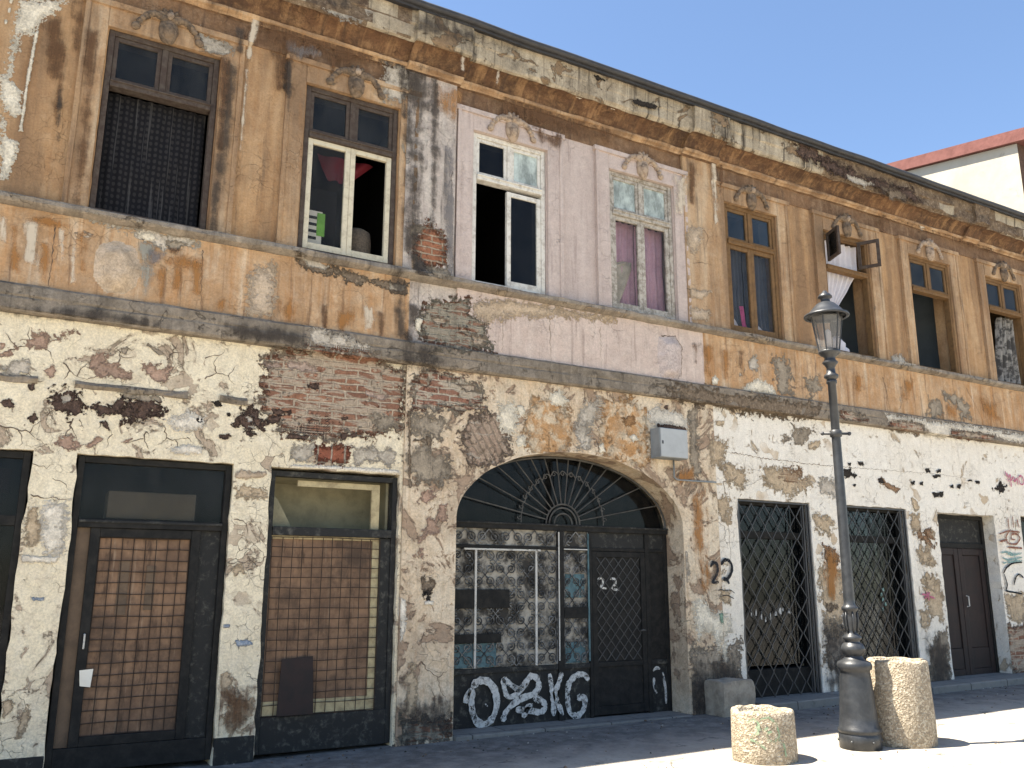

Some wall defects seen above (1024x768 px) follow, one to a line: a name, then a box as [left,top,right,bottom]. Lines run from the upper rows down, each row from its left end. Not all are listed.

peeling [0,0,68,181]
leakage [46,0,98,176]
leakage [210,19,461,272]
leakage [418,16,475,41]
spalling [794,143,923,204]
crack [5,328,96,382]
crack [167,345,237,384]
spalling [294,250,410,296]
flaking render [405,217,622,357]
crack [0,409,191,500]
flaking render [0,327,864,685]
peeling [909,498,953,682]